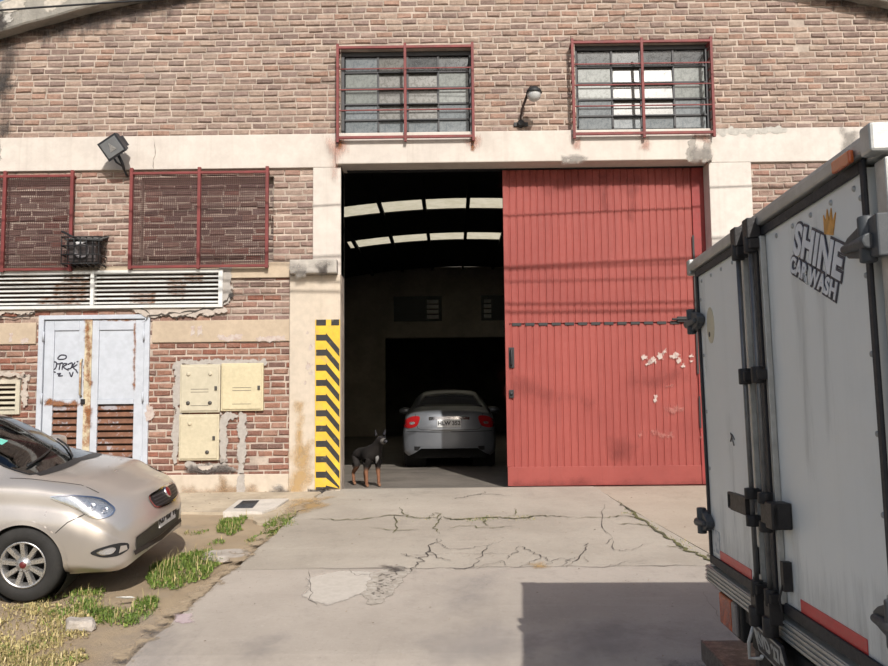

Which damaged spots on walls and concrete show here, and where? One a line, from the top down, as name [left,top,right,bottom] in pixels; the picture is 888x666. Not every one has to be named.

peeling [1,0,26,22]
peeling [44,0,67,12]
damp [0,0,186,99]
peeling [641,349,693,367]
crack [311,491,710,571]
spalling [303,566,411,605]